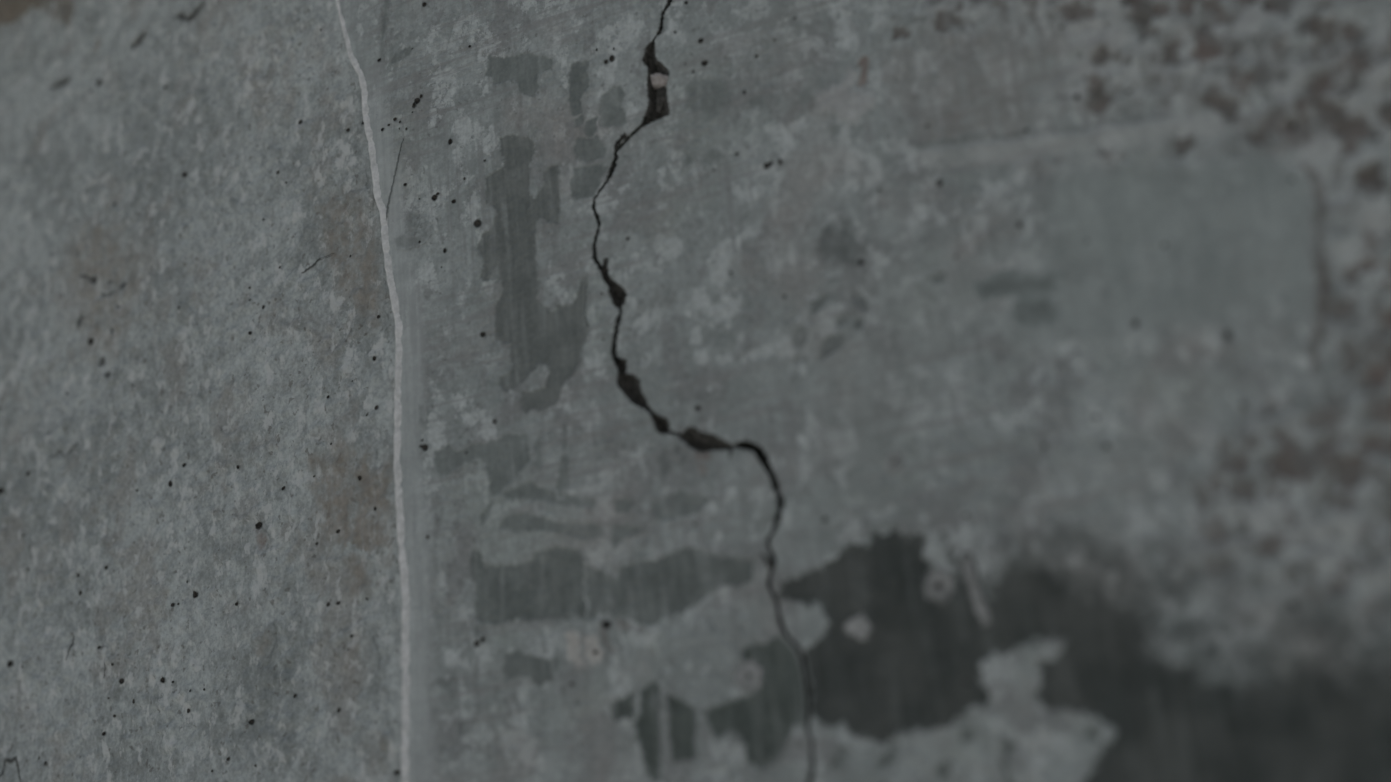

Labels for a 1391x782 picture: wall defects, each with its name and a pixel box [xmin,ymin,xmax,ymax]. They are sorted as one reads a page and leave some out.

crack [584,0,820,782]